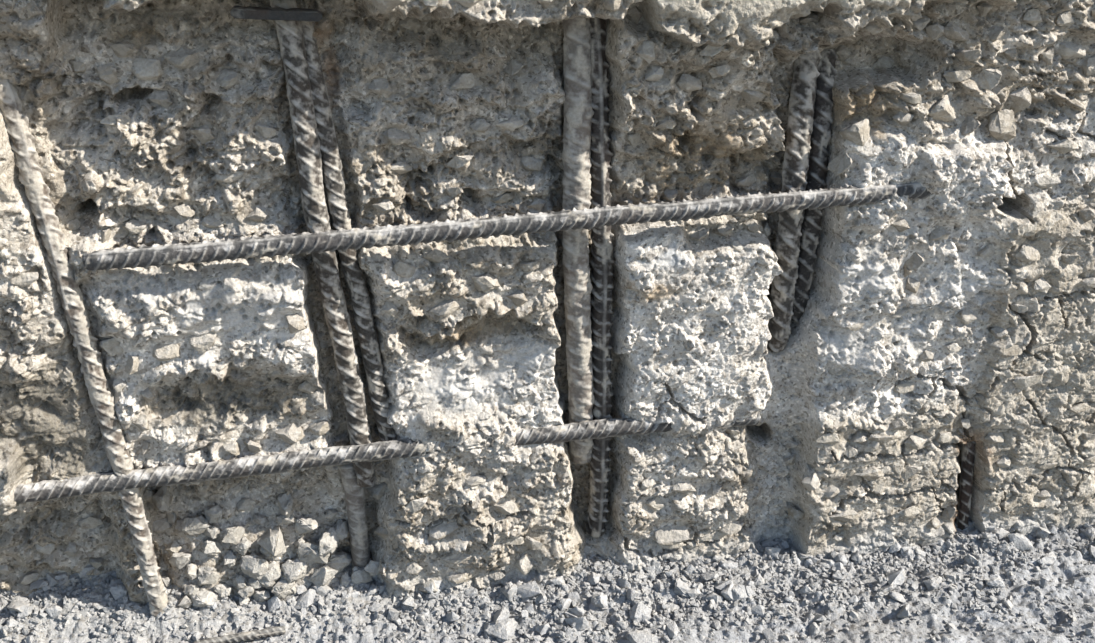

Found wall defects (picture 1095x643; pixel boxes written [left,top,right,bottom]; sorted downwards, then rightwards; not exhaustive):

spalling [300,0,1095,231]
spalling [0,0,435,617]
spalling [83,182,1095,598]
crack [657,382,707,423]
crack [807,288,1095,515]
crack [615,523,753,562]